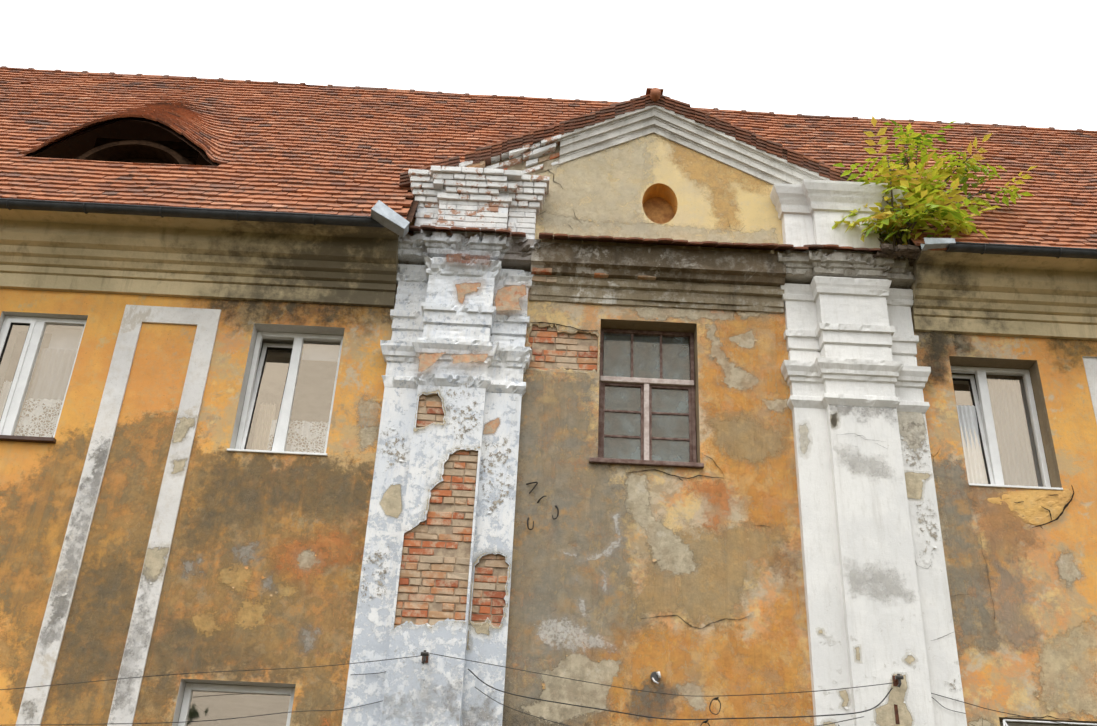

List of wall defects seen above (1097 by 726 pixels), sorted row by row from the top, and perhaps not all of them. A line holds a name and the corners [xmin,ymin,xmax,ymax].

peeling [446,253,490,265]
peeling [456,282,481,304]
peeling [494,284,526,311]
flaking render [526,322,600,374]
leakage [0,413,373,726]
flaking render [356,352,513,650]
peeling [625,473,701,576]
leakage [932,459,1038,655]
crack [642,615,749,629]
peeling [521,652,621,725]
peeling [875,653,915,726]
peeling [1034,616,1097,721]